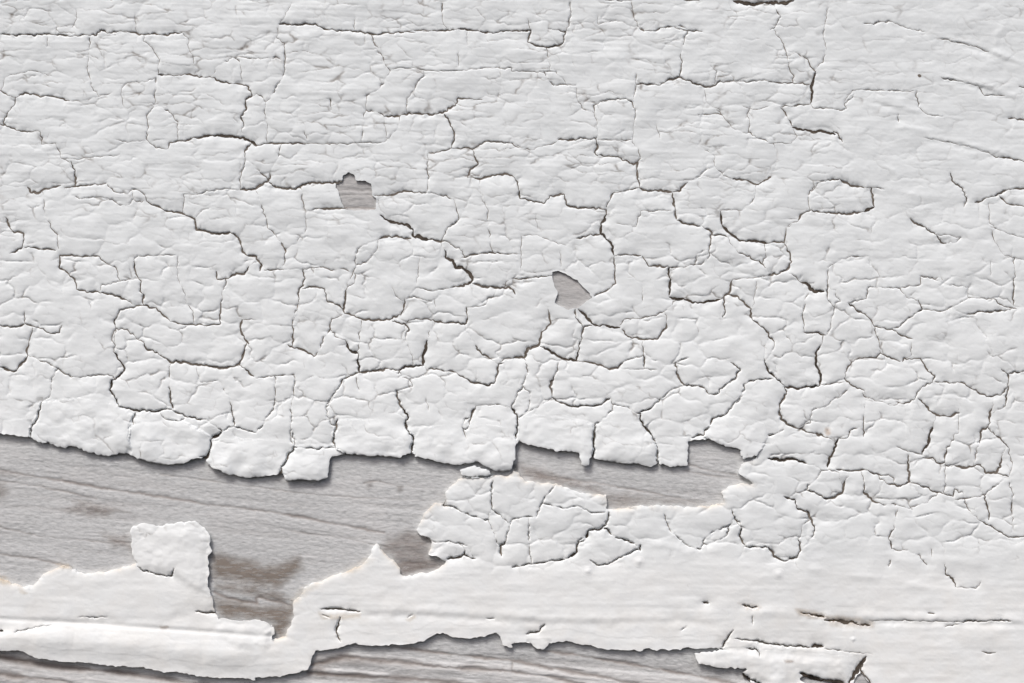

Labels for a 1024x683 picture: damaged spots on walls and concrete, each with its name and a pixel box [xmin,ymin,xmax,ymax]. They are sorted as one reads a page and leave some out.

peeling [336,172,376,211]
crack [0,0,1024,538]
peeling [552,271,592,310]
peeling [0,398,765,654]
crack [424,482,641,568]
crack [664,497,815,562]
peeling [0,633,869,683]